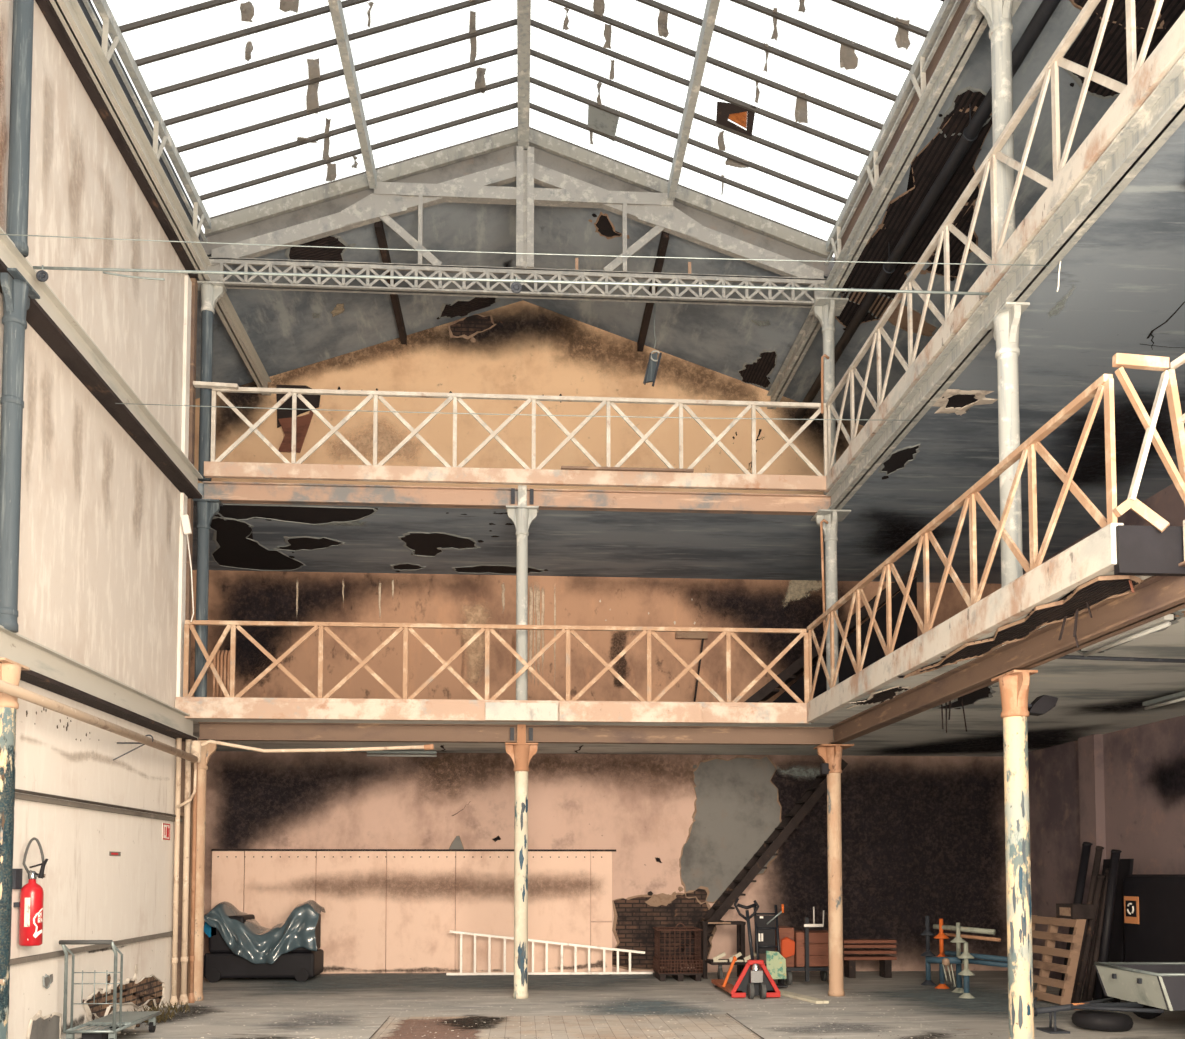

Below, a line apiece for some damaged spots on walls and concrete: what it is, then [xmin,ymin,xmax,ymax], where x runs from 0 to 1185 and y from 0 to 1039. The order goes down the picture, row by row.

spalling [835,86,992,337]
spalling [437,297,504,343]
spalling [738,349,777,389]
spalling [933,389,998,416]
spalling [878,443,921,480]
spalling [210,504,379,571]
spalling [390,512,514,572]
spalling [452,564,548,575]
spalling [847,575,1144,710]
peeling [0,706,16,1022]
spalling [612,756,819,971]
peeling [1010,791,1032,953]